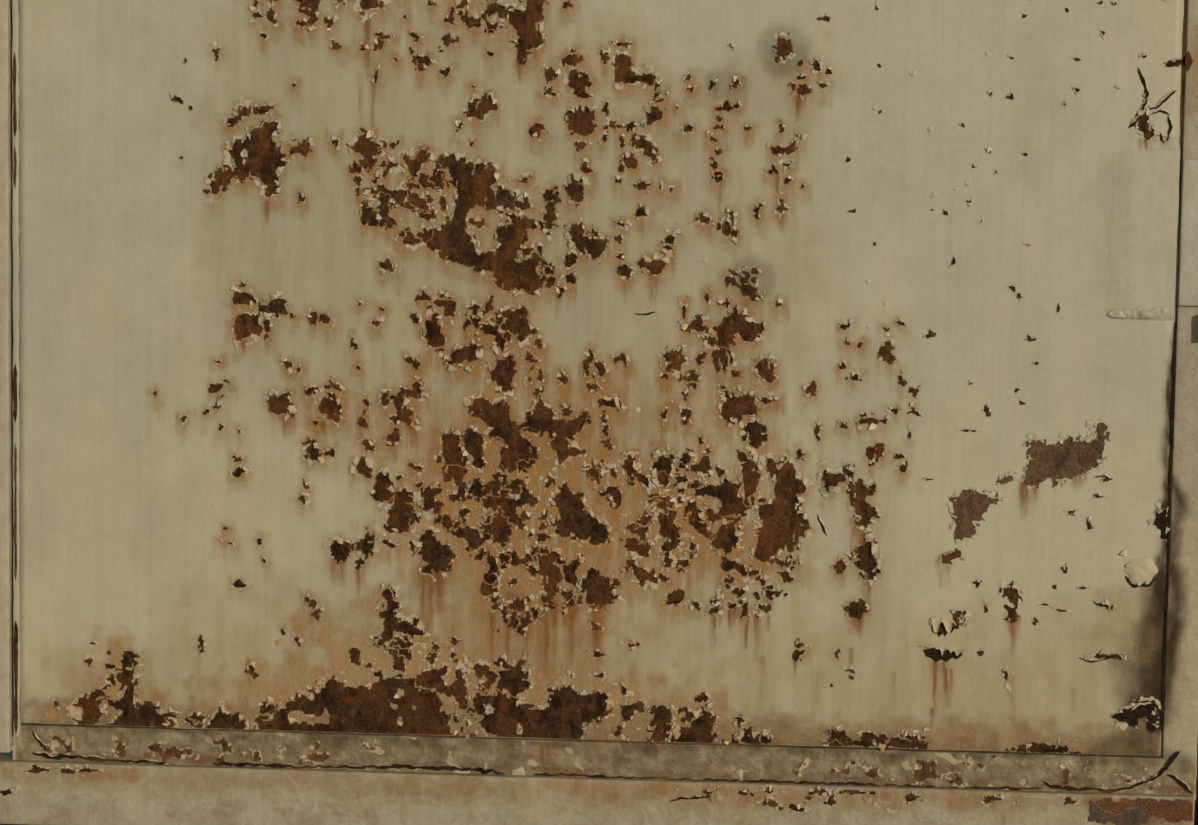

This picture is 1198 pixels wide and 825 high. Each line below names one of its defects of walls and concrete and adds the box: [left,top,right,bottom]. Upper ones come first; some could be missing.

rust [429,0,574,68]
peeling [170,93,194,112]
rust [218,103,314,214]
peeling [1130,108,1160,141]
peeling [179,379,230,426]
peeling [202,0,923,636]
rust [353,39,805,661]
rust [45,321,1177,754]
peeling [939,416,1117,567]
peeling [0,583,773,798]
peeling [792,638,811,662]
peeling [1109,696,1161,730]